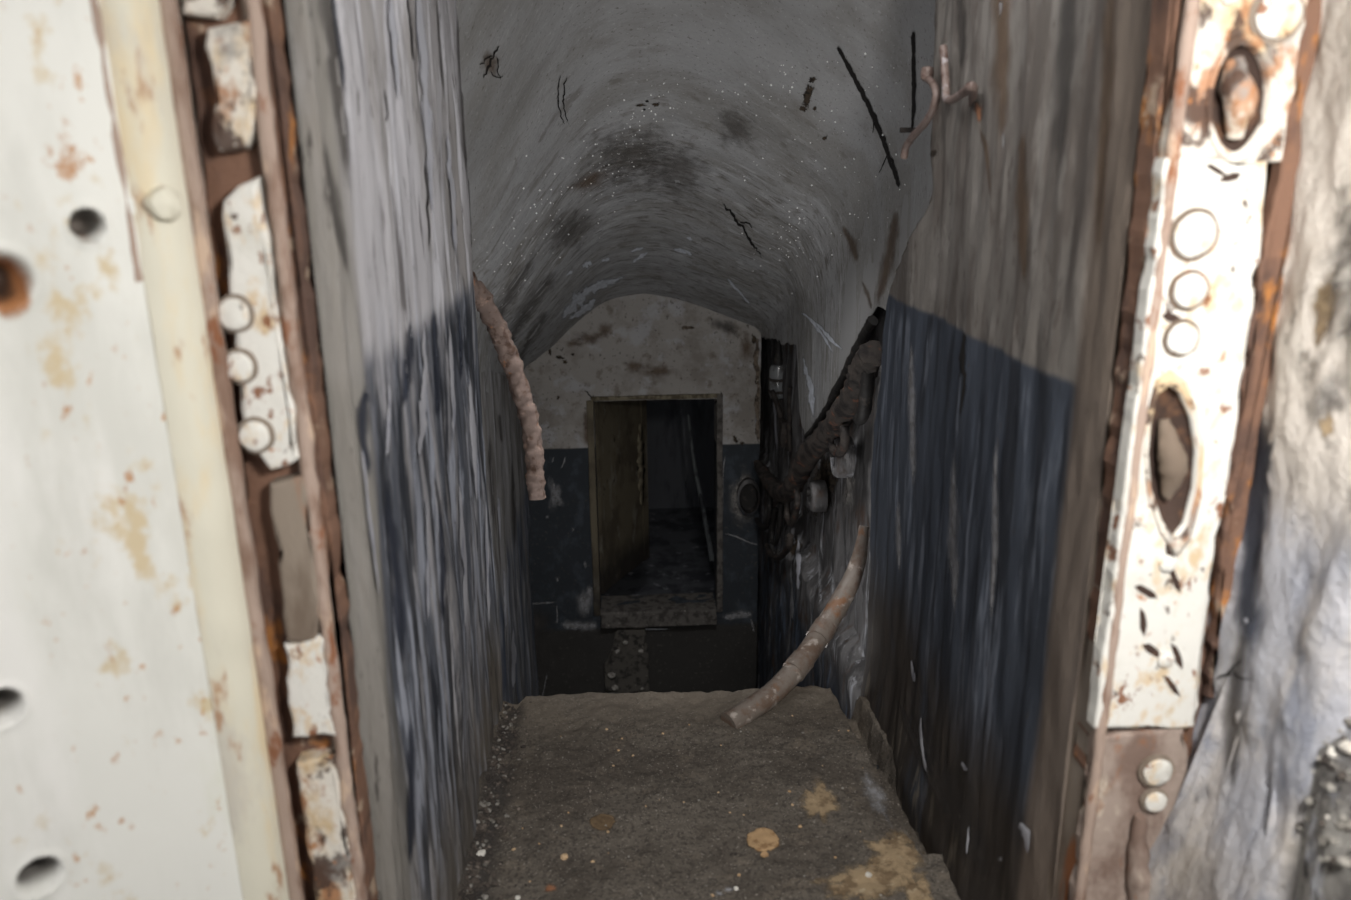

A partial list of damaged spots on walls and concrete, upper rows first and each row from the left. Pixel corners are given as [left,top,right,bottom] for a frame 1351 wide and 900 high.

crack [724,204,761,257]
damp [804,783,838,818]
damp [747,827,779,858]
damp [815,831,932,900]